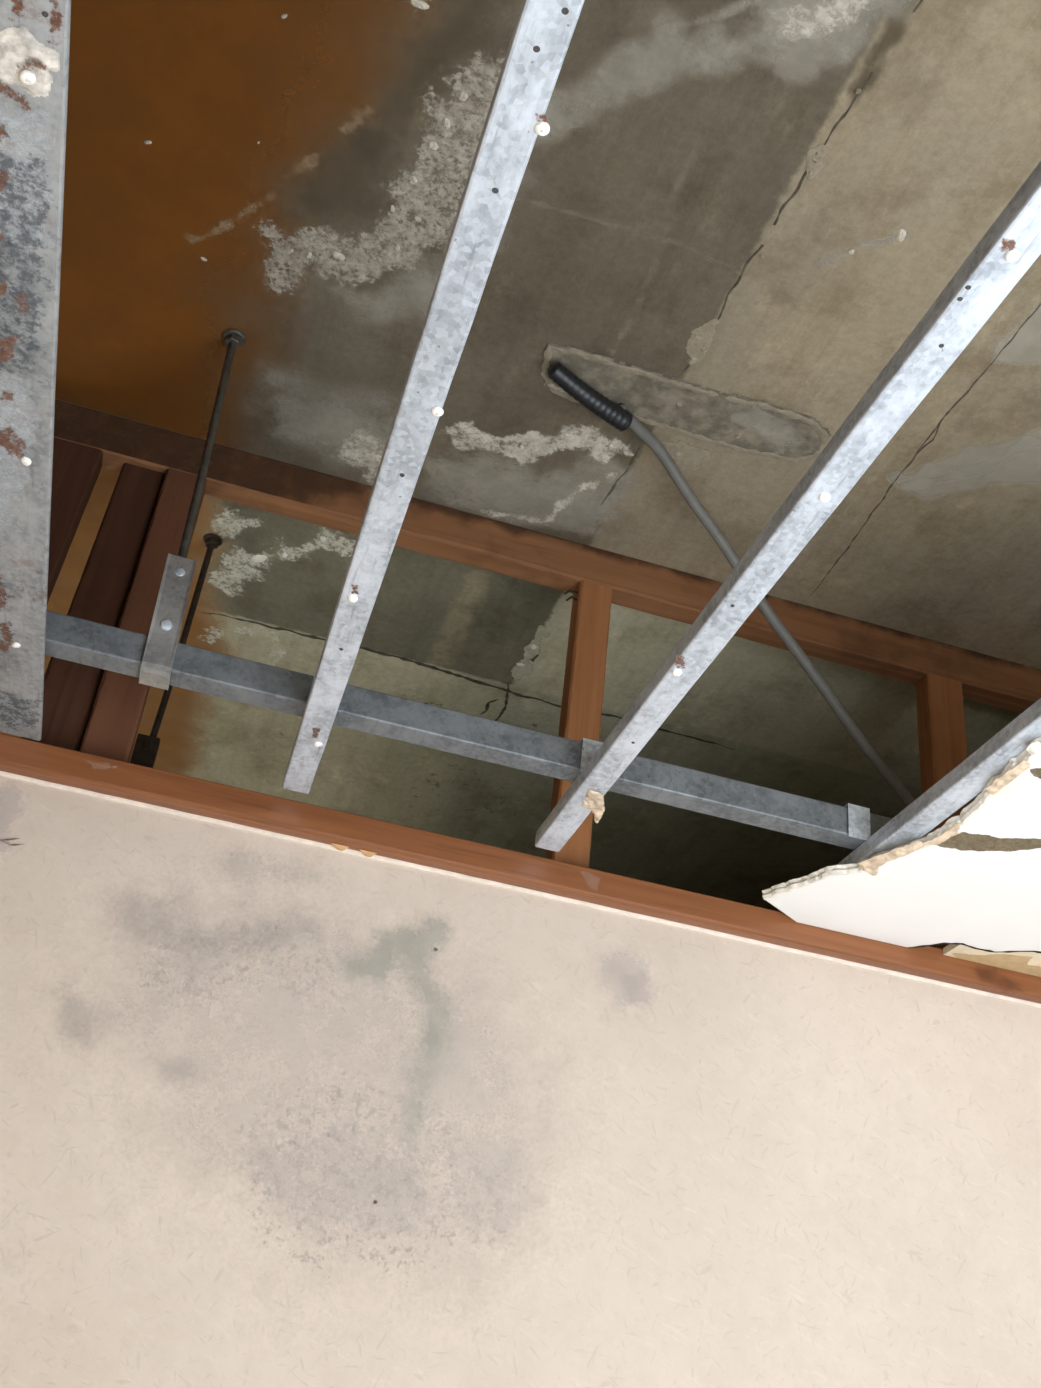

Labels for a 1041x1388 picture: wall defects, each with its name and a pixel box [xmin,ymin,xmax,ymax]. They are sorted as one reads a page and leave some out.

corrosion [0,0,408,447]
leakage [190,0,505,320]
corrosion [47,468,120,615]
corrosion [129,686,207,775]
leakage [54,375,388,504]
crack [205,613,326,641]
leakage [208,510,356,597]
crack [359,646,561,721]
spalling [511,625,549,680]
leakage [410,420,719,582]
crack [812,302,1041,594]
spalling [762,737,1041,900]